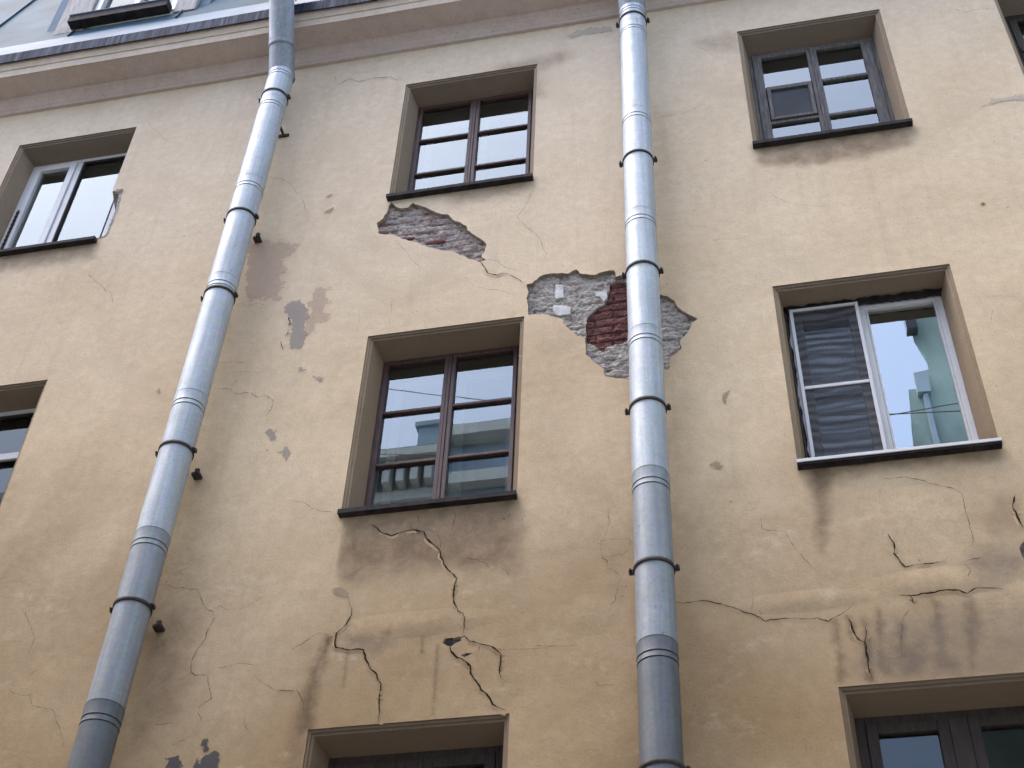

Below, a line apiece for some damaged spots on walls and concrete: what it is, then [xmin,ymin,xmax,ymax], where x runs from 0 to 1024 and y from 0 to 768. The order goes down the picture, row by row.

flaking render [377,202,486,262]
crack [466,263,526,296]
peeling [284,299,310,349]
flaking render [520,269,629,380]
flaking render [660,295,697,371]
crack [1009,495,1023,530]
crack [370,510,511,716]
crack [677,477,1004,682]
crack [292,597,385,725]
peeling [165,739,220,768]